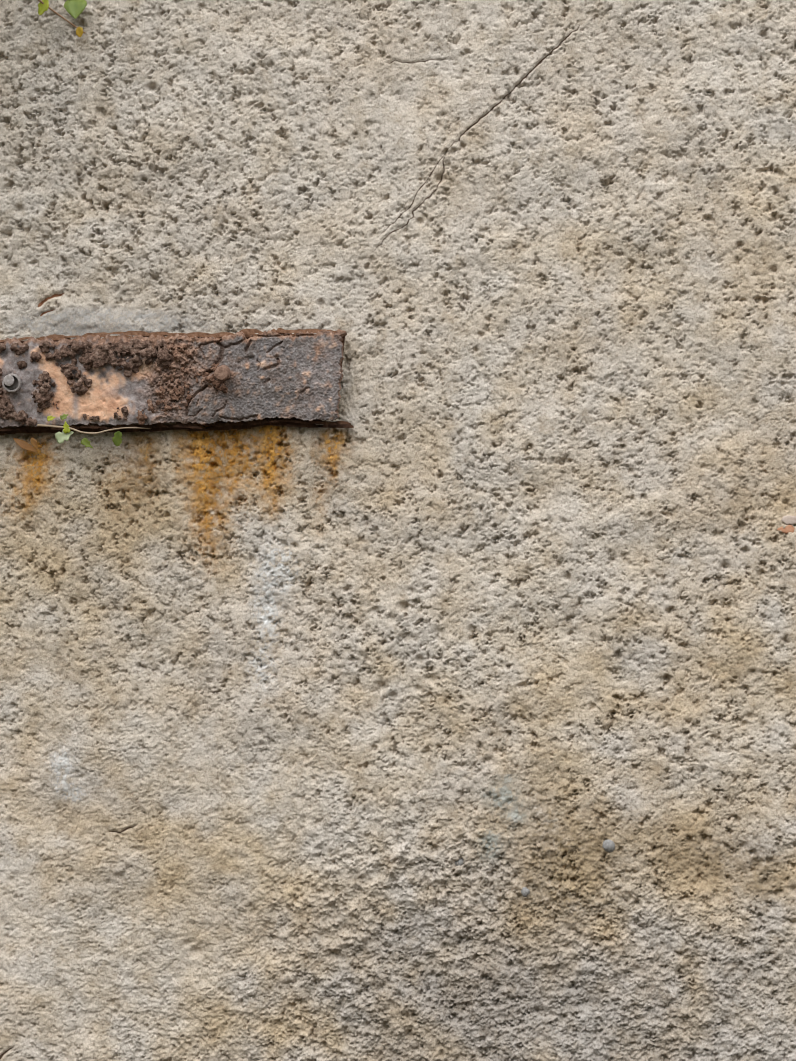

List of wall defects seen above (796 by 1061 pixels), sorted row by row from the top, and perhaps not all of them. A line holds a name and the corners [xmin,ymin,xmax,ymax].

corrosion [0,328,354,528]